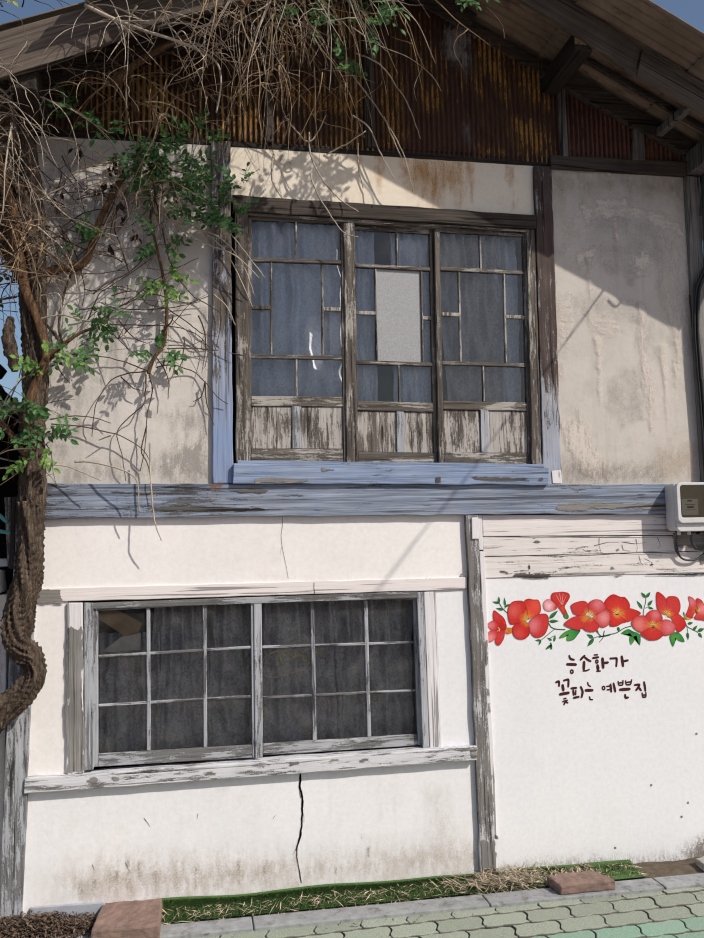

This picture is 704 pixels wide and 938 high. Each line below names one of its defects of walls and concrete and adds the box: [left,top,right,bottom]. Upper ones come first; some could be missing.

peeling [230,477,308,494]
peeling [673,531,704,564]
peeling [500,565,551,578]
crack [294,773,304,883]
damp [690,839,704,858]